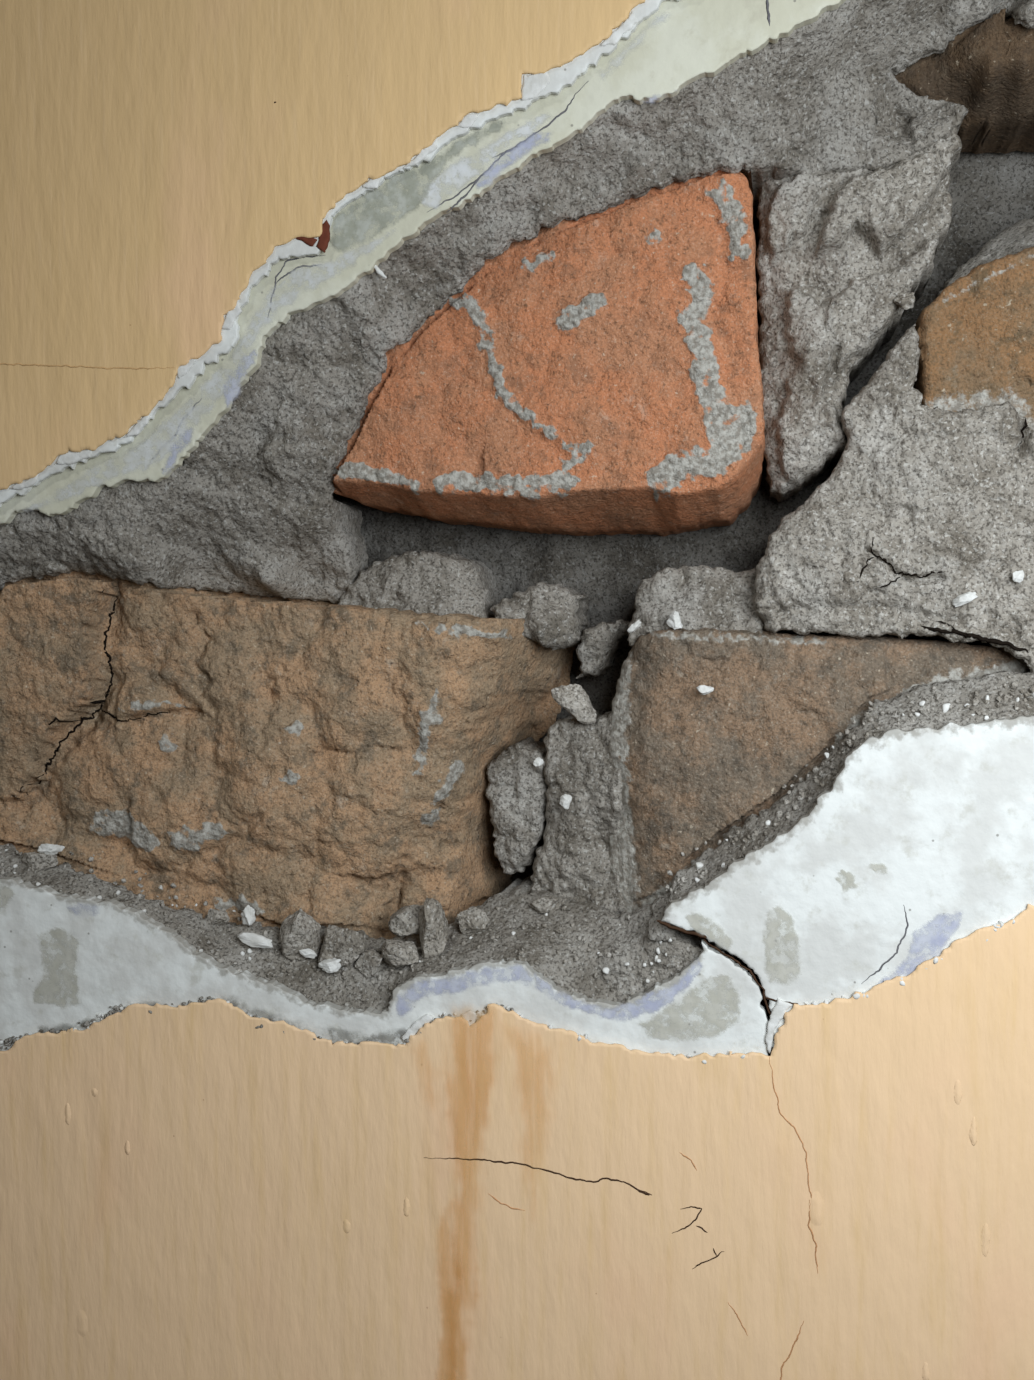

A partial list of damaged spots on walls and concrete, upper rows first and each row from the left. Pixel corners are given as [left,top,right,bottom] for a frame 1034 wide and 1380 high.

spalling [0,0,846,525]
peeling [666,611,683,630]
peeling [952,592,978,607]
peeling [1012,570,1024,583]
crack [16,586,171,799]
peeling [696,685,714,695]
spalling [0,715,1034,1058]
crack [657,920,798,1015]
crack [424,1157,652,1211]
crack [769,1057,818,1273]
crack [673,1206,724,1269]
crack [780,1321,804,1380]